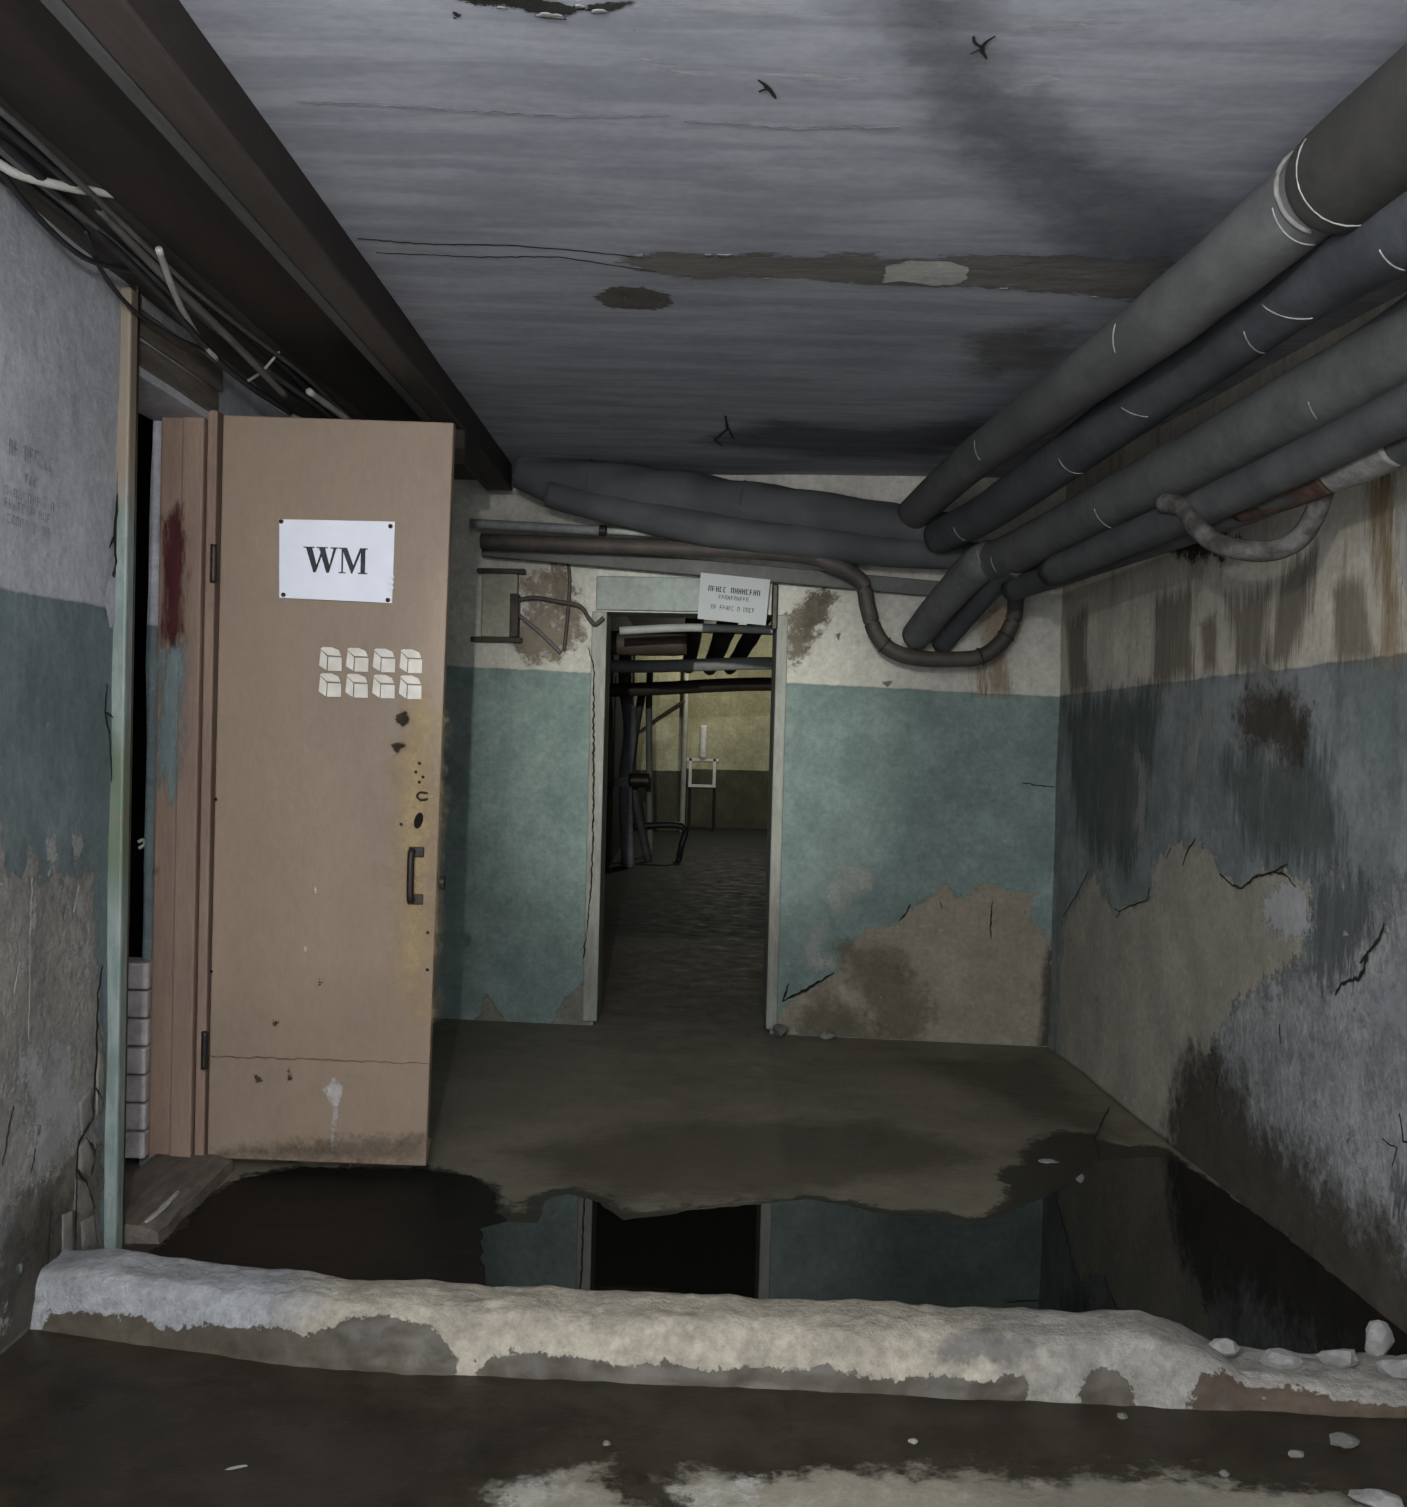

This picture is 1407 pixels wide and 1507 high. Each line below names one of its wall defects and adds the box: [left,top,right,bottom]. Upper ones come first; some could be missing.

spalling [452,0,635,20]
spalling [616,250,1175,303]
damp [708,421,981,456]
damp [1334,579,1371,660]
damp [1067,545,1318,874]
crack [1114,888,1150,917]
crack [1219,864,1296,889]
damp [1223,744,1375,998]
crack [1335,923,1385,995]
peeling [0,820,108,1285]
peeling [772,838,1407,1273]
crack [47,965,103,1264]